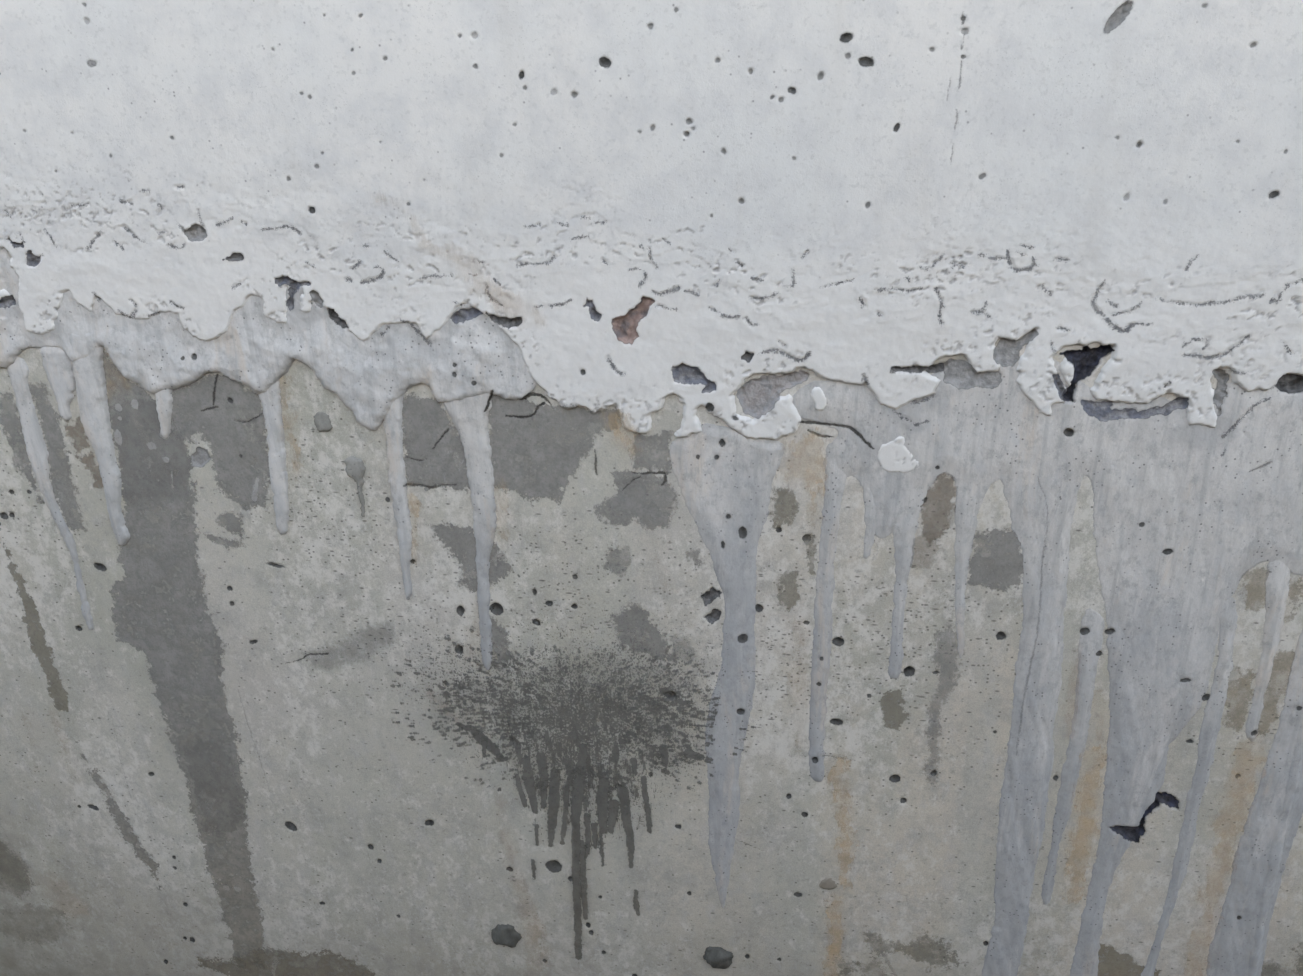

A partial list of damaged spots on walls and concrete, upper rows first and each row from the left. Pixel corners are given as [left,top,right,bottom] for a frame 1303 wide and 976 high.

leakage [0,383,104,531]
spalling [275,261,349,328]
leakage [402,393,470,491]
leakage [488,395,621,506]
spalling [535,244,755,344]
spalling [672,363,716,393]
spalling [890,280,1189,422]
spalling [1182,334,1303,456]
leakage [5,547,68,712]
leakage [103,348,375,976]
leakage [391,598,759,960]
spalling [1110,792,1179,843]